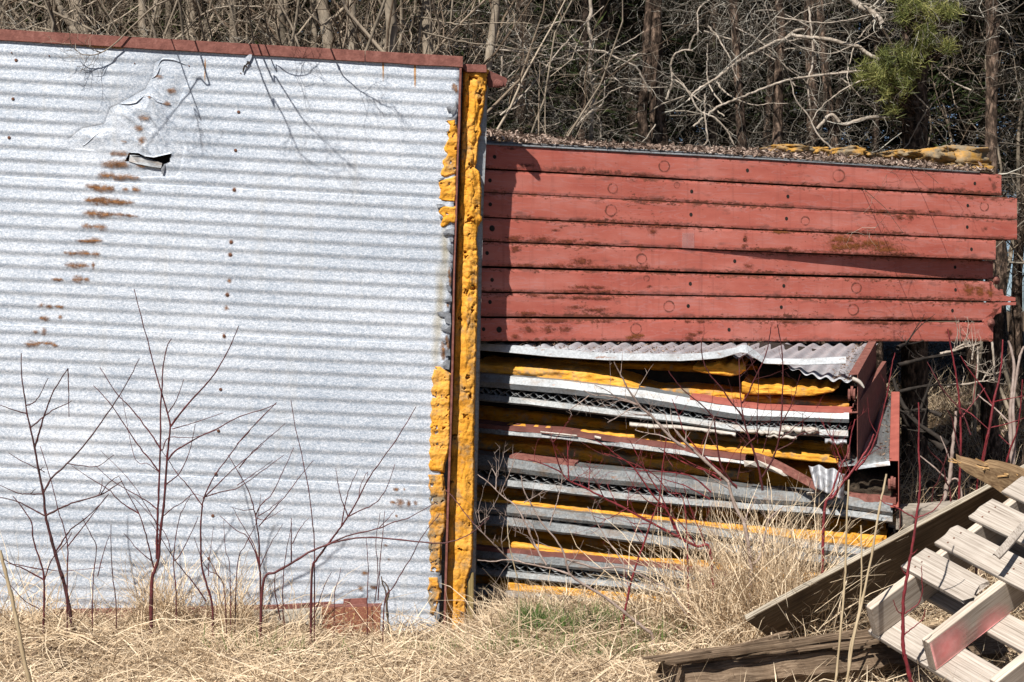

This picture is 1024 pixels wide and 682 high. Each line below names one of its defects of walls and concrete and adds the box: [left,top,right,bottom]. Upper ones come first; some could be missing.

corrosion [53,115,148,282]
corrosion [27,304,63,347]